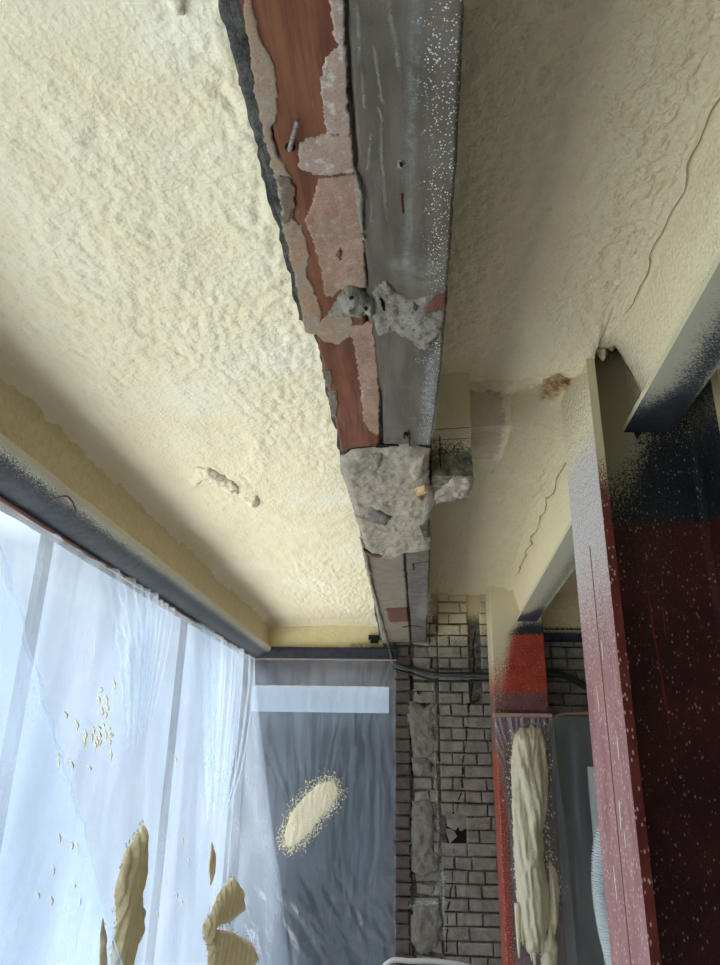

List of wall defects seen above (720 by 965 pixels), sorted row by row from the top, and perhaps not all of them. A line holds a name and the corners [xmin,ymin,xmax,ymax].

crack [625,97,720,314]
peeling [243,0,448,559]
corrosion [543,374,569,398]
crack [515,462,566,576]
spalling [407,701,435,777]
spalling [410,798,467,877]
spalling [410,904,443,955]